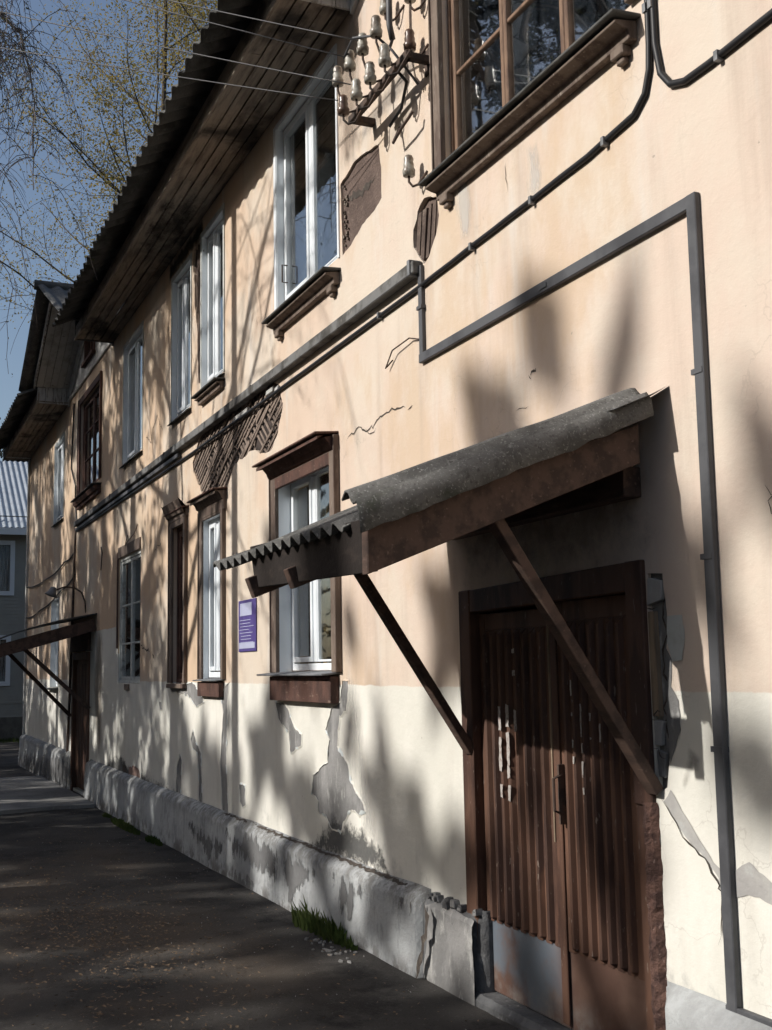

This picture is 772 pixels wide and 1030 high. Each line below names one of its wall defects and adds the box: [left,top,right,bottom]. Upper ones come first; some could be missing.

crack [348,406,411,437]
peeling [169,681,205,708]
peeling [175,729,203,803]
peeling [220,681,247,812]
peeling [275,700,303,755]
peeling [311,679,367,835]
flaking render [647,573,681,791]
peeling [188,820,315,903]